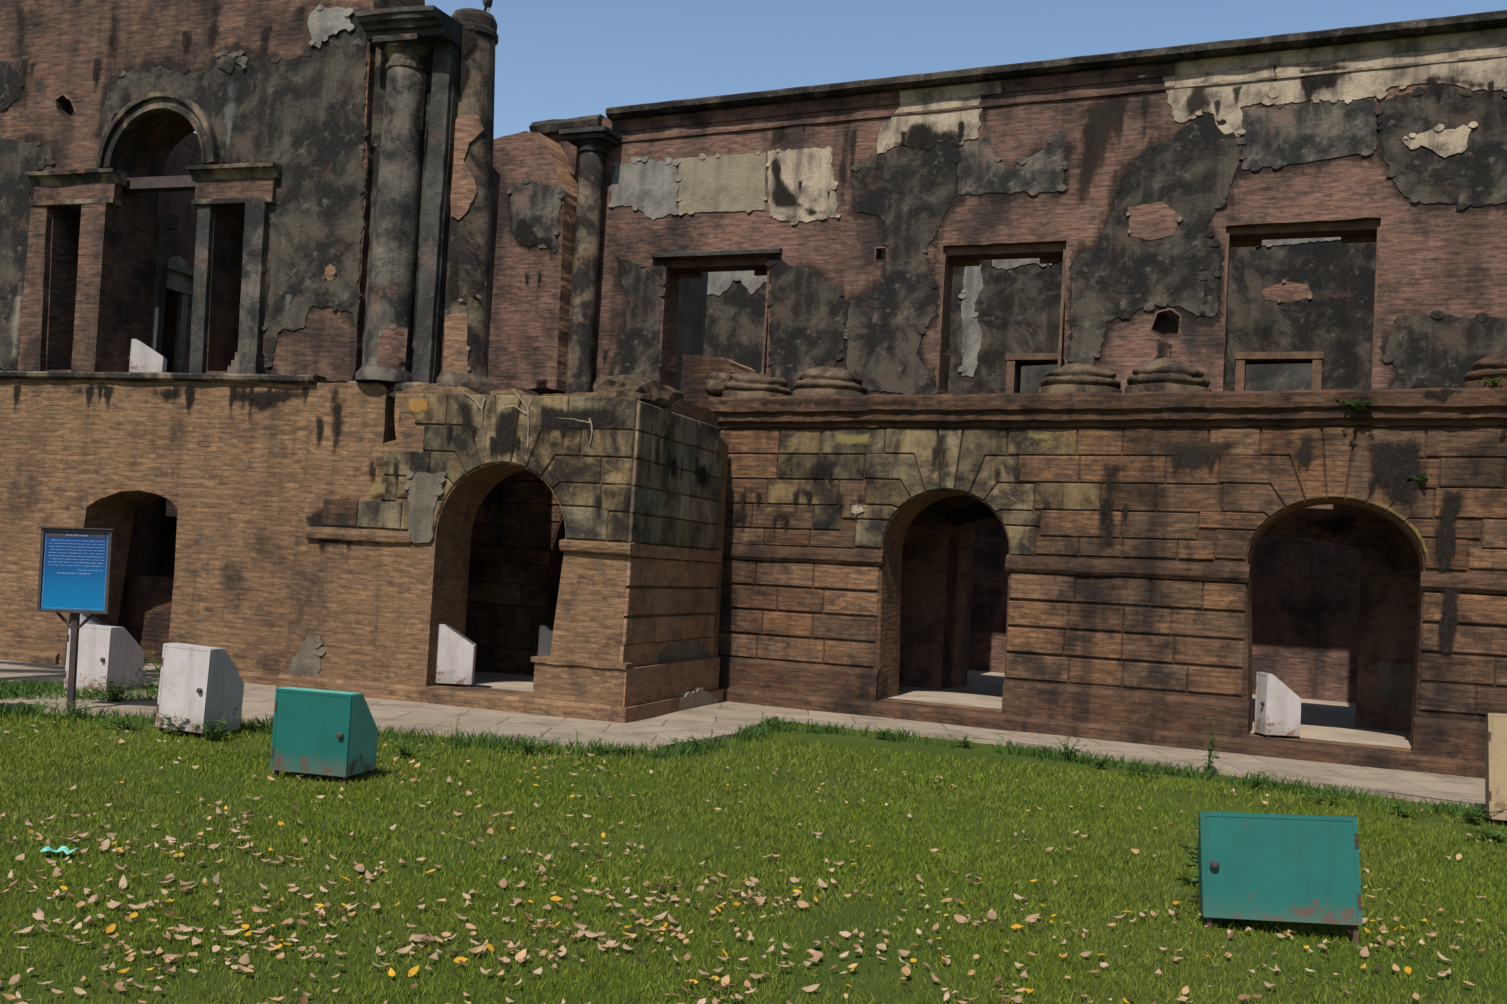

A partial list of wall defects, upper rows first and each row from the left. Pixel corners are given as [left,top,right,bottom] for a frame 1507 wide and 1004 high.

peeling [0,61,27,112]
water stain [897,95,987,150]
water stain [1187,86,1242,116]
water stain [1301,63,1347,104]
peeling [0,134,60,371]
peeling [96,4,369,374]
spalling [450,114,484,220]
peeling [506,177,567,256]
peeling [608,42,1507,395]
water stain [446,400,520,456]
water stain [540,405,625,442]
water stain [1369,439,1462,653]